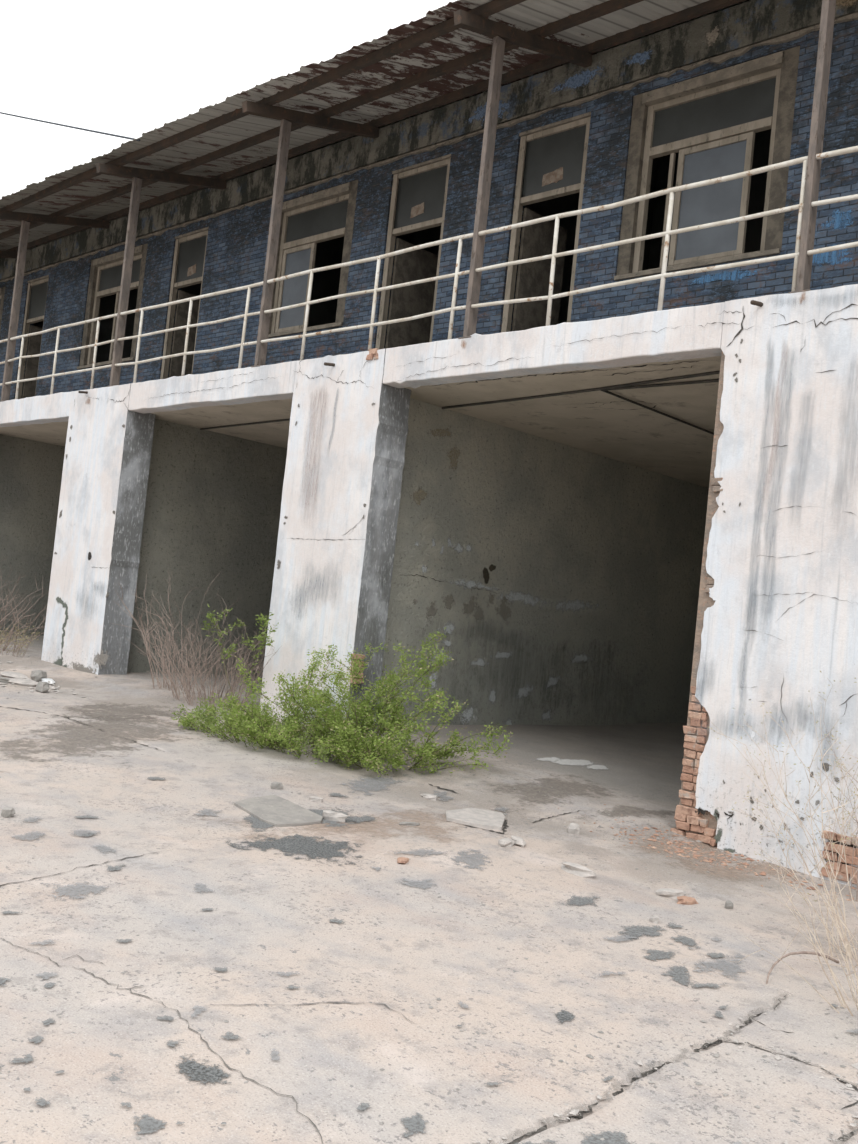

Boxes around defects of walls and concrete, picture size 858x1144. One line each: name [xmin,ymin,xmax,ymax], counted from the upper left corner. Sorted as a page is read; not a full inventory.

crack [74,304,858,405]
flaking render [671,686,717,846]
spalling [821,830,858,885]